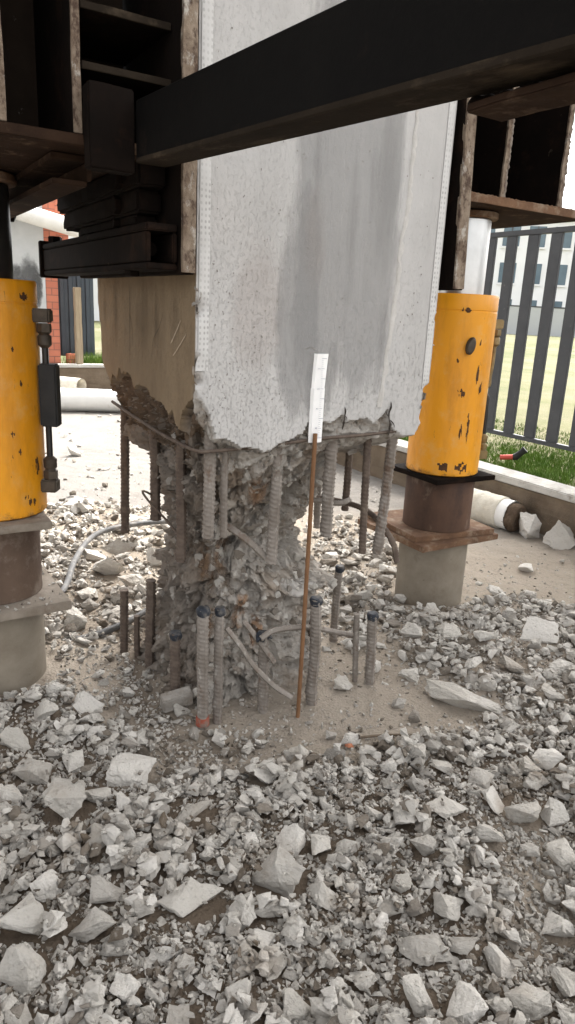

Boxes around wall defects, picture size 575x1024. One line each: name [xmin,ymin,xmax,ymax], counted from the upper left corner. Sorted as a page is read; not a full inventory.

spalling [108,109,433,565]
spalling [119,578,157,668]
spalling [196,564,379,730]